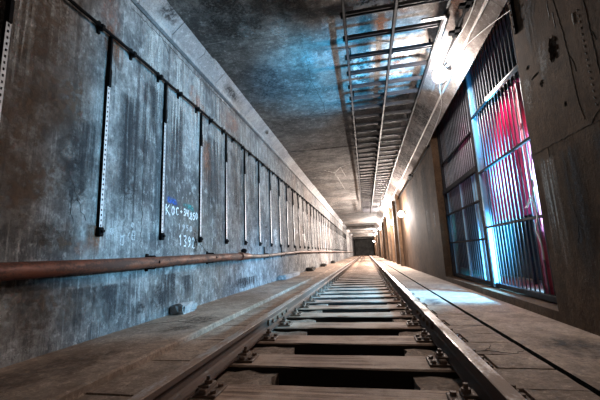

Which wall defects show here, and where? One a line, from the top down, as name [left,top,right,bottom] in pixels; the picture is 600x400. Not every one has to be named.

damp [120,31,163,199]
damp [193,77,203,135]
spalling [525,36,558,87]
crack [536,0,600,154]